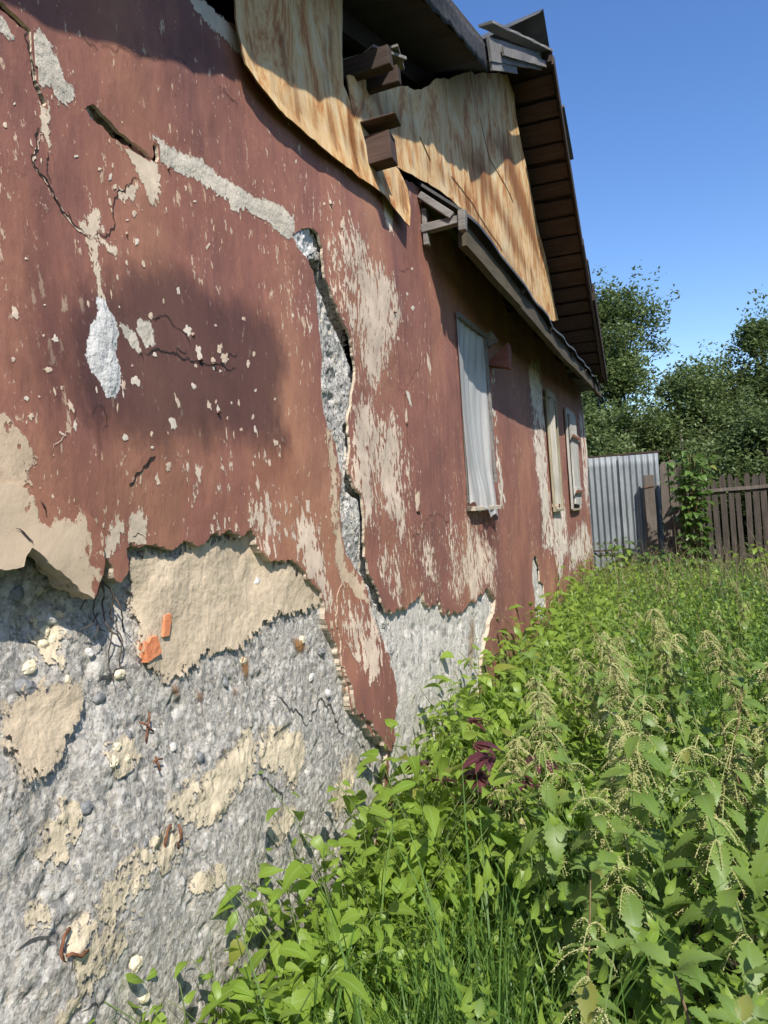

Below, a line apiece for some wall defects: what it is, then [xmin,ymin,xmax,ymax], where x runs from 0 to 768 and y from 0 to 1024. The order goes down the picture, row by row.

crack [31,105,148,242]
rust [349,110,363,169]
rust [465,133,541,278]
crack [140,314,237,371]
crack [129,456,155,486]
crack [293,228,398,670]
peeling [529,358,594,619]
flaking render [0,194,499,1024]